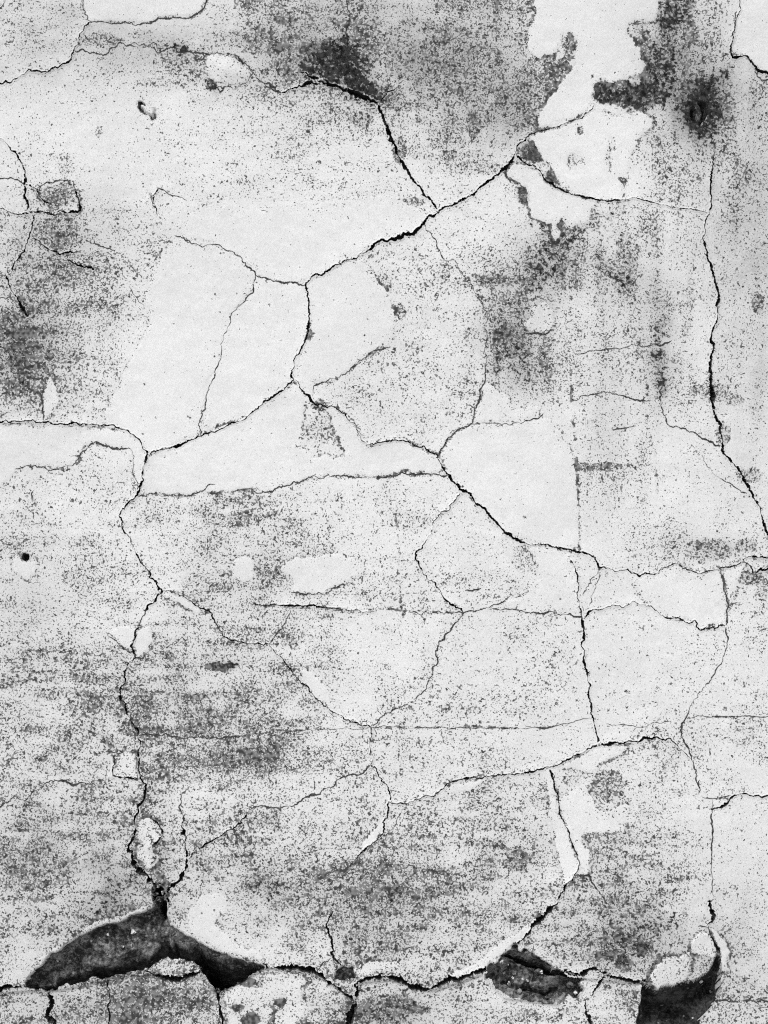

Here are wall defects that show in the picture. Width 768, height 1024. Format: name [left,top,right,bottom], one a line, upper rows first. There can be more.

crack [0,0,208,86]
crack [728,0,768,81]
crack [0,137,112,317]
crack [148,70,768,541]
crack [0,417,768,955]
crack [0,982,58,1024]
spalling [21,893,310,1024]
crack [144,967,226,1024]
crack [264,905,487,1024]
spalling [453,924,586,1004]
crack [564,965,642,1024]
spalling [636,928,730,1024]